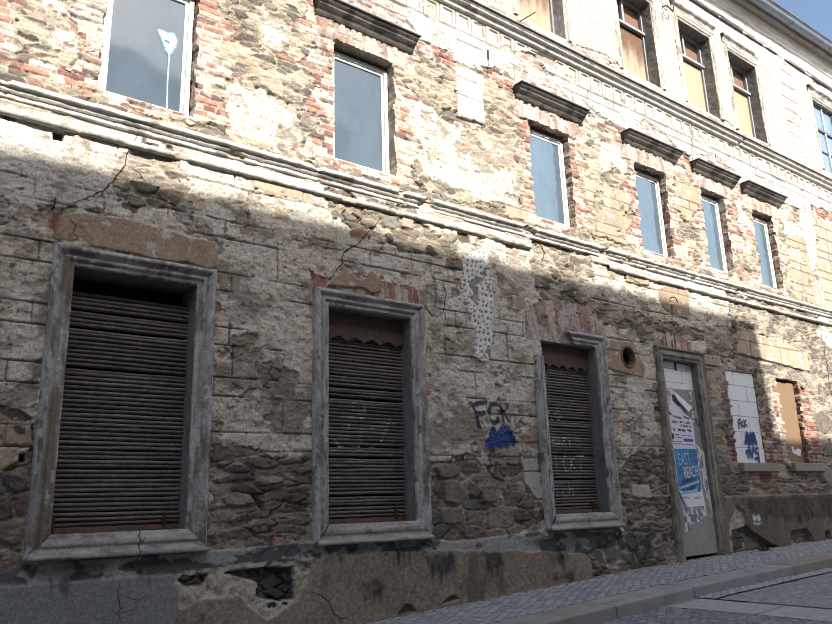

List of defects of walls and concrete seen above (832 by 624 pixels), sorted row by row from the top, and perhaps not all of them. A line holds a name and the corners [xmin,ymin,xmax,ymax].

crack [66,135,142,242]
crack [312,216,383,284]
flaking render [0,0,832,308]
flaking render [524,239,832,553]
crack [117,584,150,623]
peeling [0,401,677,619]